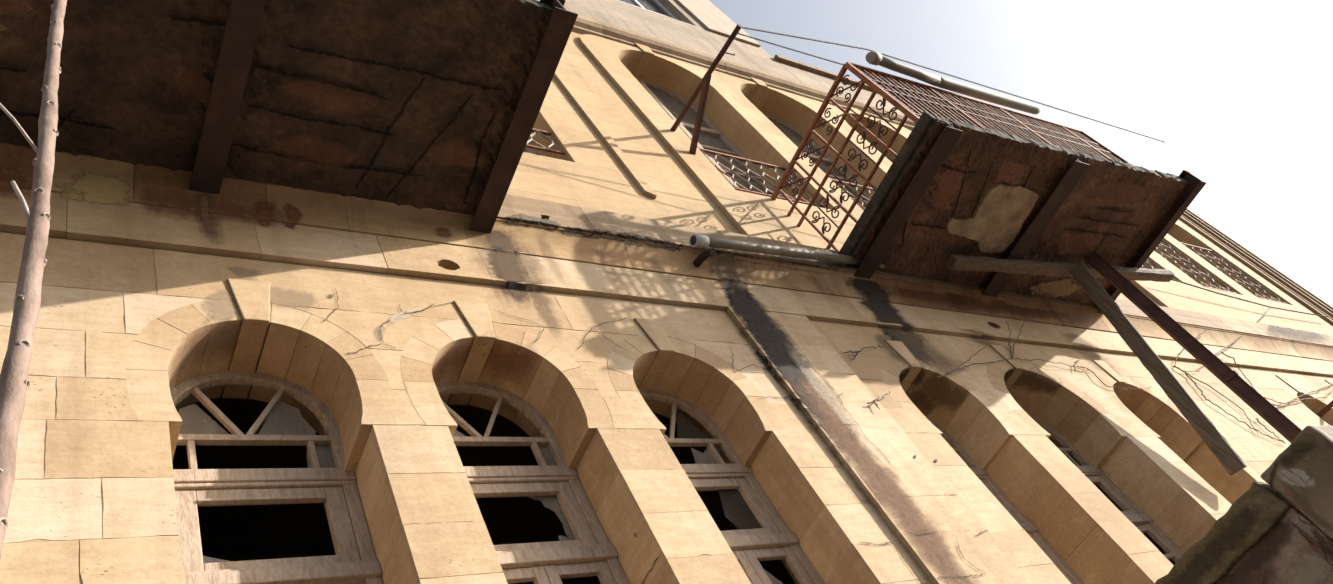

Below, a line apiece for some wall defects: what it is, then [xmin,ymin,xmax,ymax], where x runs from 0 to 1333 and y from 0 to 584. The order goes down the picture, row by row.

water stain [481,231,540,300]
crack [346,301,453,354]
crack [577,317,630,352]
water stain [706,248,971,584]